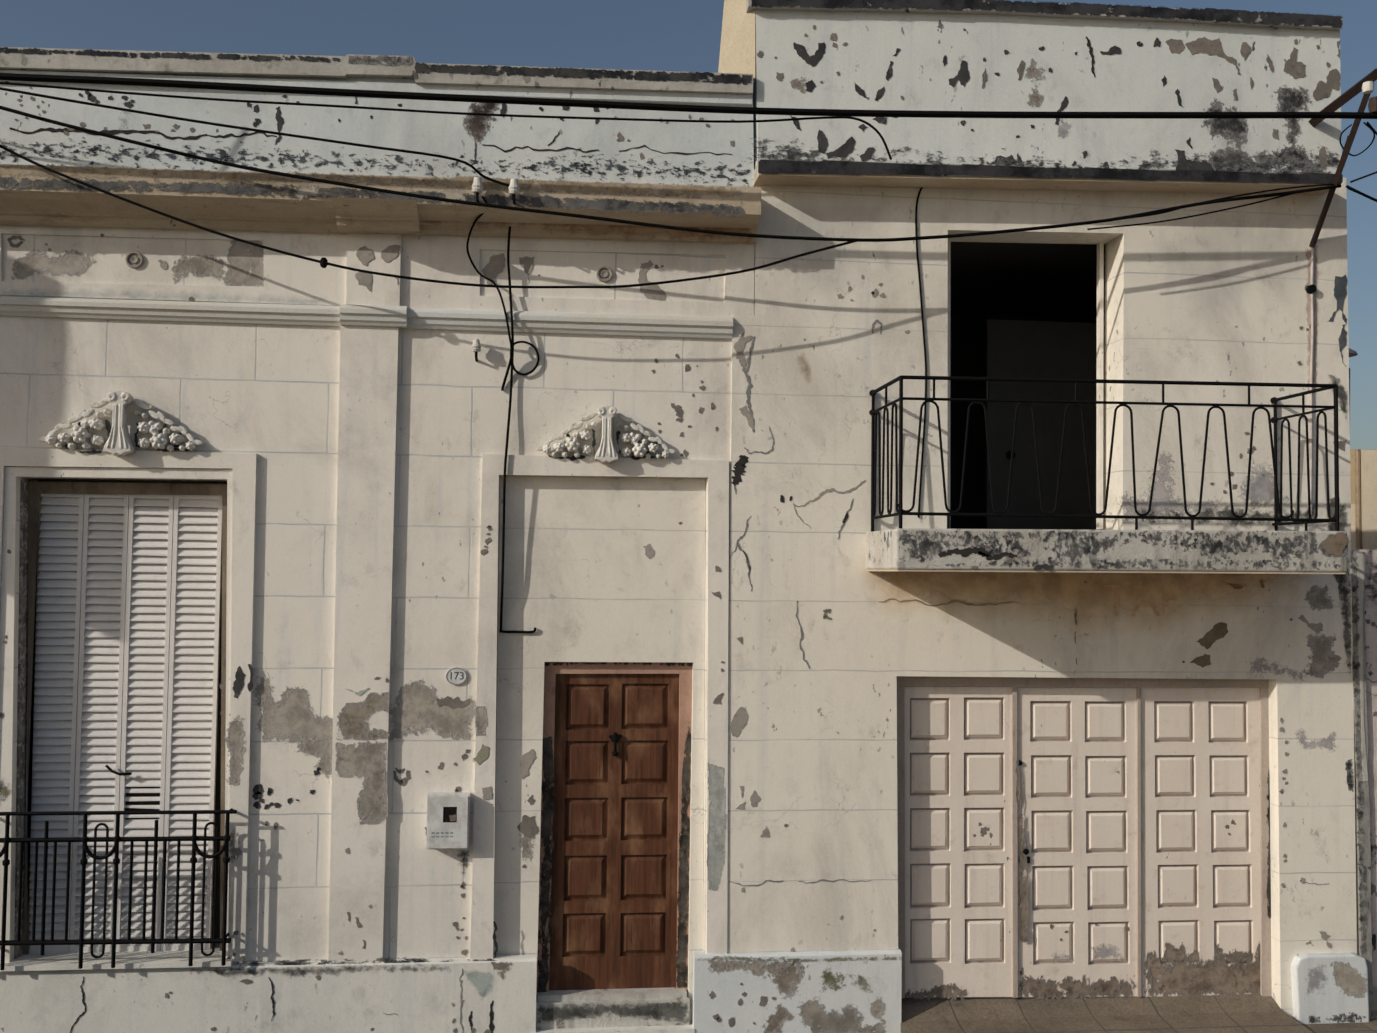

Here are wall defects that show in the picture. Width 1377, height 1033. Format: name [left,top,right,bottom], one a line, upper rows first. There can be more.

peeling [1100,37,1340,172]
crack [730,332,774,591]
crack [793,480,866,539]
crack [795,601,810,669]
crack [881,598,1019,606]
peeling [219,664,489,841]
peeling [674,728,691,988]
peeling [707,762,761,891]
crack [730,878,871,886]
crack [70,977,86,1033]
spalling [708,948,886,1033]
peeling [1018,924,1260,1000]